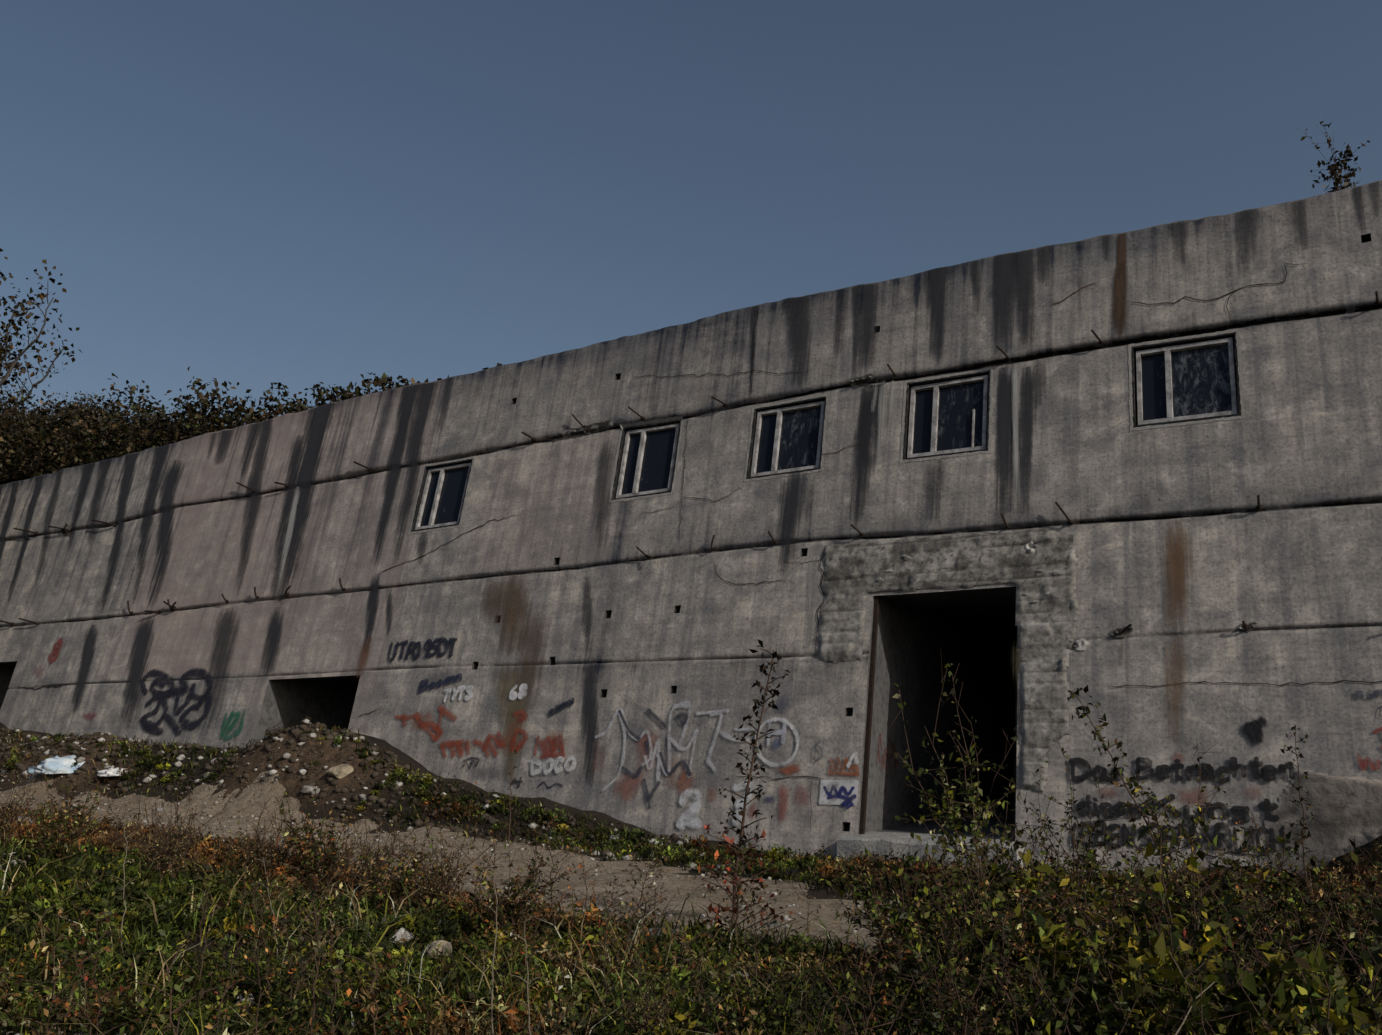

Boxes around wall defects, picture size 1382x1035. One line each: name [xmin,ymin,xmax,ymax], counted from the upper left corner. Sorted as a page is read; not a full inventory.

leakage [928,267,947,361]
leakage [972,246,1049,514]
rust [1114,233,1127,334]
crack [1133,263,1306,318]
leakage [0,470,62,601]
leakage [70,445,184,721]
leakage [217,419,272,582]
leakage [261,403,335,675]
leakage [364,377,453,649]
leakage [850,381,893,520]
rust [1168,528,1186,619]
crack [1107,679,1382,687]